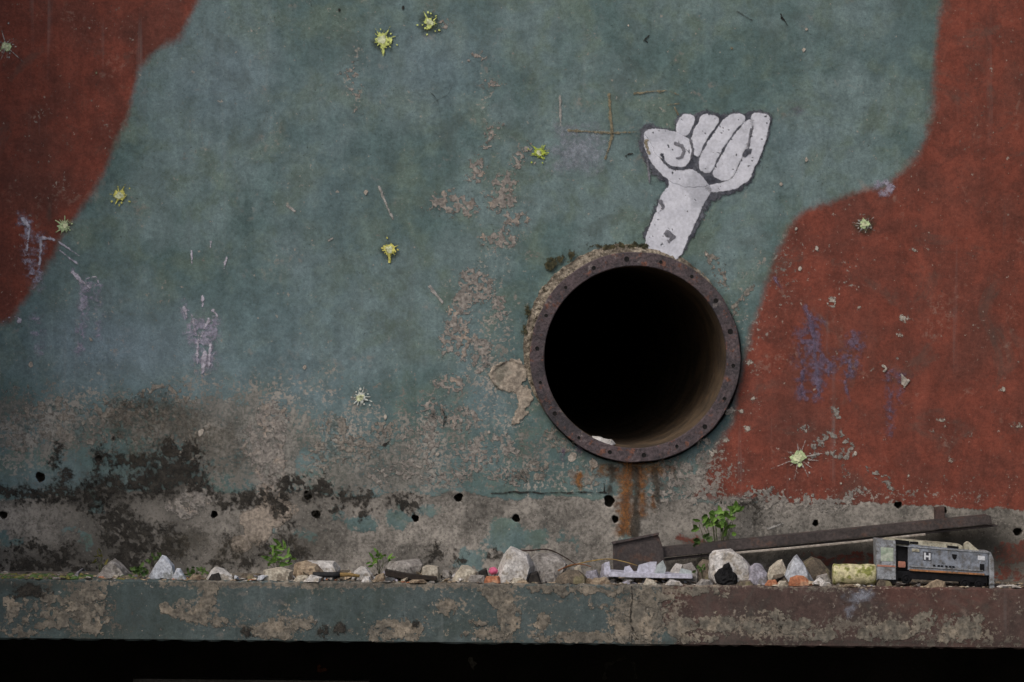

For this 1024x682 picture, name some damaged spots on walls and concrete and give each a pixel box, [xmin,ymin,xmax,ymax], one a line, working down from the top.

peeling [421,123,536,253]
peeling [310,267,601,489]
peeling [643,406,867,518]
water stain [0,438,423,599]
corrosion [598,461,676,535]
water stain [418,541,467,569]
peeling [0,584,111,638]
peeling [159,582,231,630]
peeling [251,614,317,640]
peeling [367,597,458,642]
peeling [461,585,986,645]